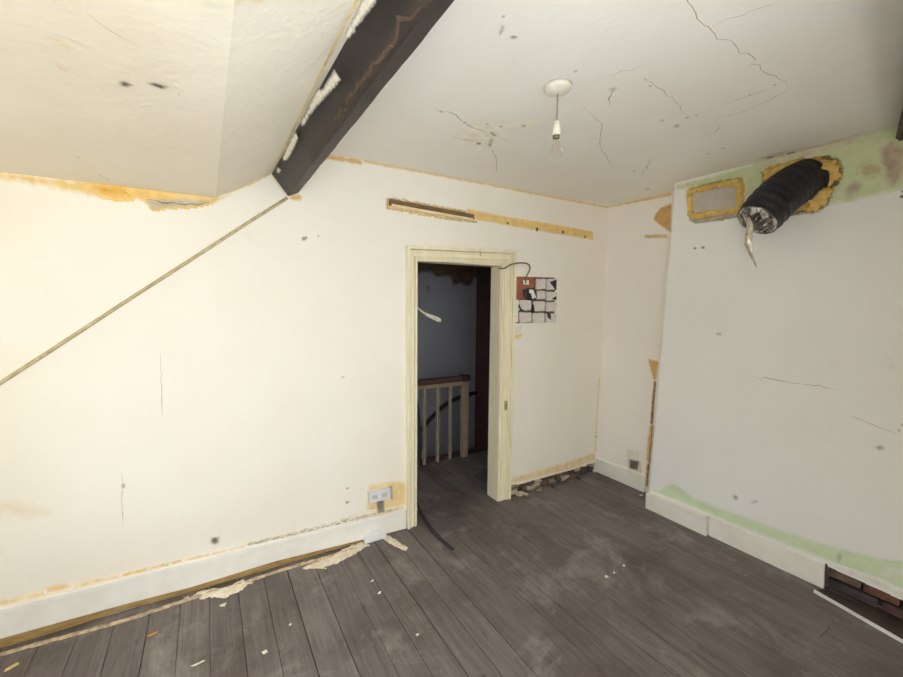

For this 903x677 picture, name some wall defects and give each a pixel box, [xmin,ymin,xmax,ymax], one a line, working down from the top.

peeling [0,0,361,212]
flaking render [448,112,556,154]
peeling [325,127,903,233]
crack [687,0,788,131]
flaking render [418,263,477,286]
flaking render [647,358,659,380]
flaking render [511,451,596,495]
flaking render [627,458,642,473]
peeling [0,479,406,606]
peeling [652,482,903,619]